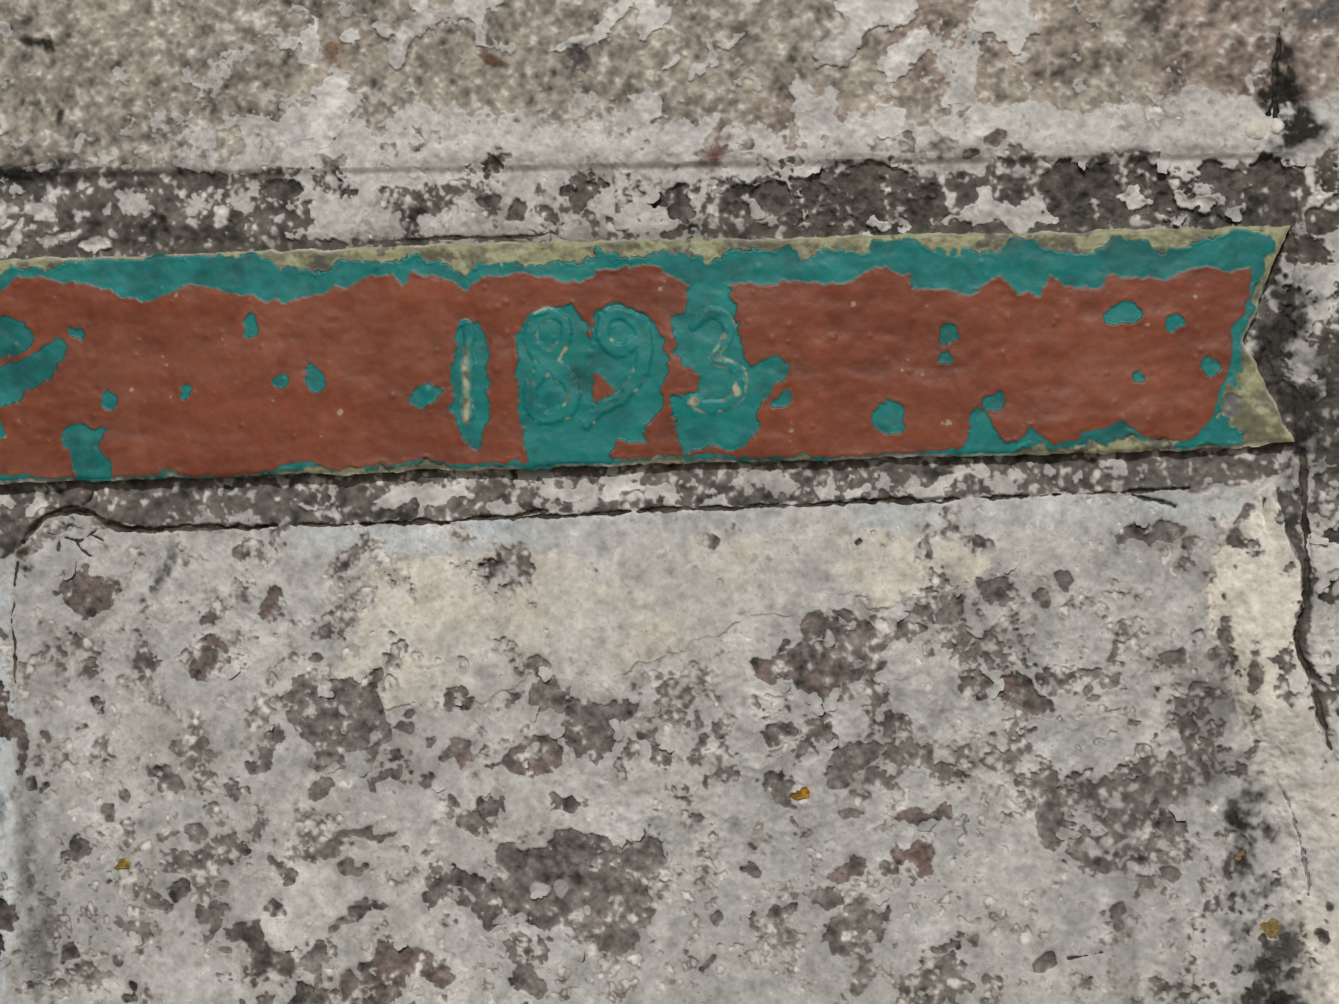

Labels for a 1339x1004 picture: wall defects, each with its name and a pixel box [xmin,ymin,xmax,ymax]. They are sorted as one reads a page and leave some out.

crack [1265,8,1284,119]
peeling [0,315,84,407]
peeling [515,152,1306,467]
peeling [223,653,415,802]
peeling [427,655,687,778]
crack [11,486,1190,683]
peeling [750,563,1073,789]
crack [1293,448,1332,750]
peeling [99,823,396,1004]
peeling [351,934,455,1004]
peeling [422,786,666,1004]
peeling [745,802,953,967]